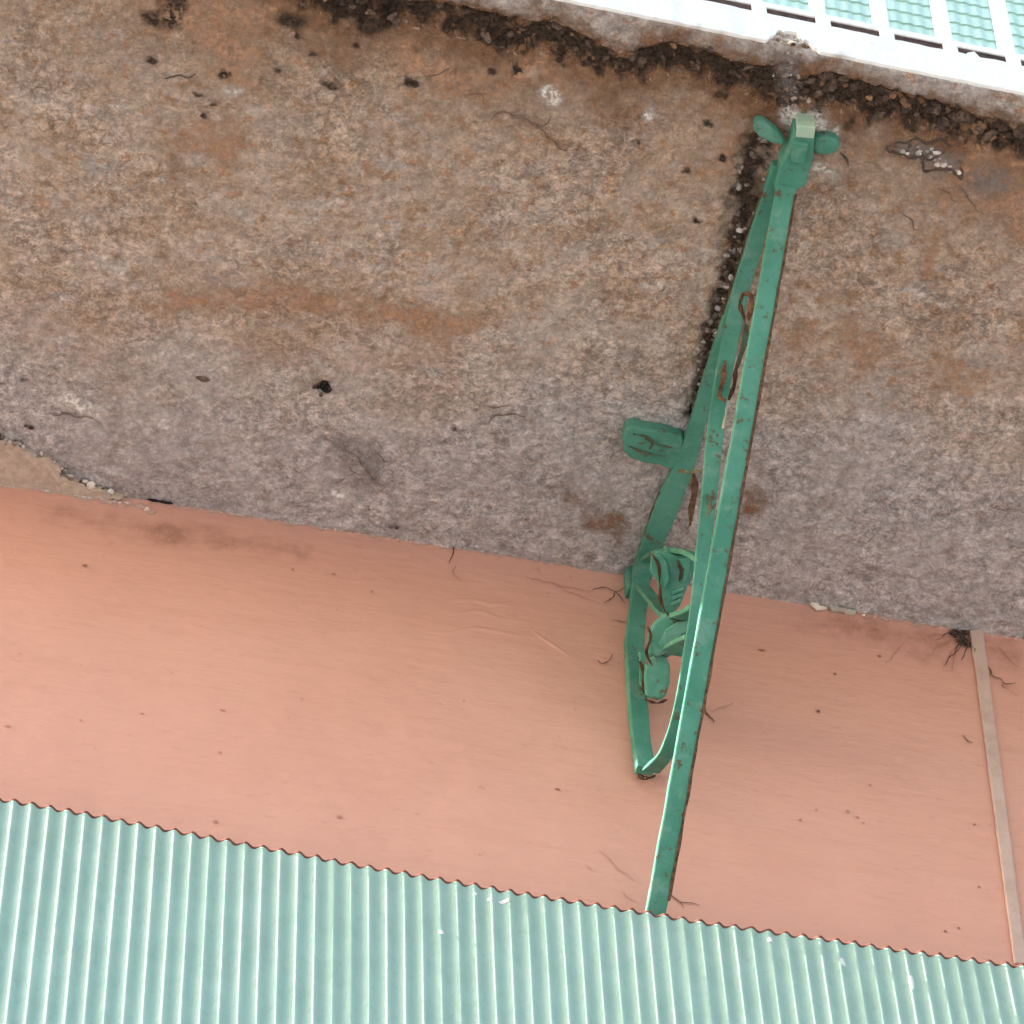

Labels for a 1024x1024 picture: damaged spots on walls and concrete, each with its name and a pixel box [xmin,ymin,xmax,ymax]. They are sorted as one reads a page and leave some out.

spalling [265,0,1024,186]
spalling [685,133,771,415]
spalling [0,433,173,514]